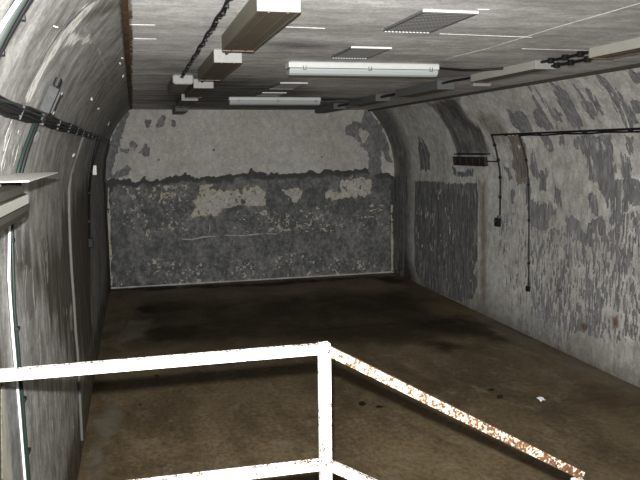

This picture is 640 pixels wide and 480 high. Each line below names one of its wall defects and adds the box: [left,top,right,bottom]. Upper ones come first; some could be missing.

peeling [106,110,478,302]
peeling [498,74,640,347]